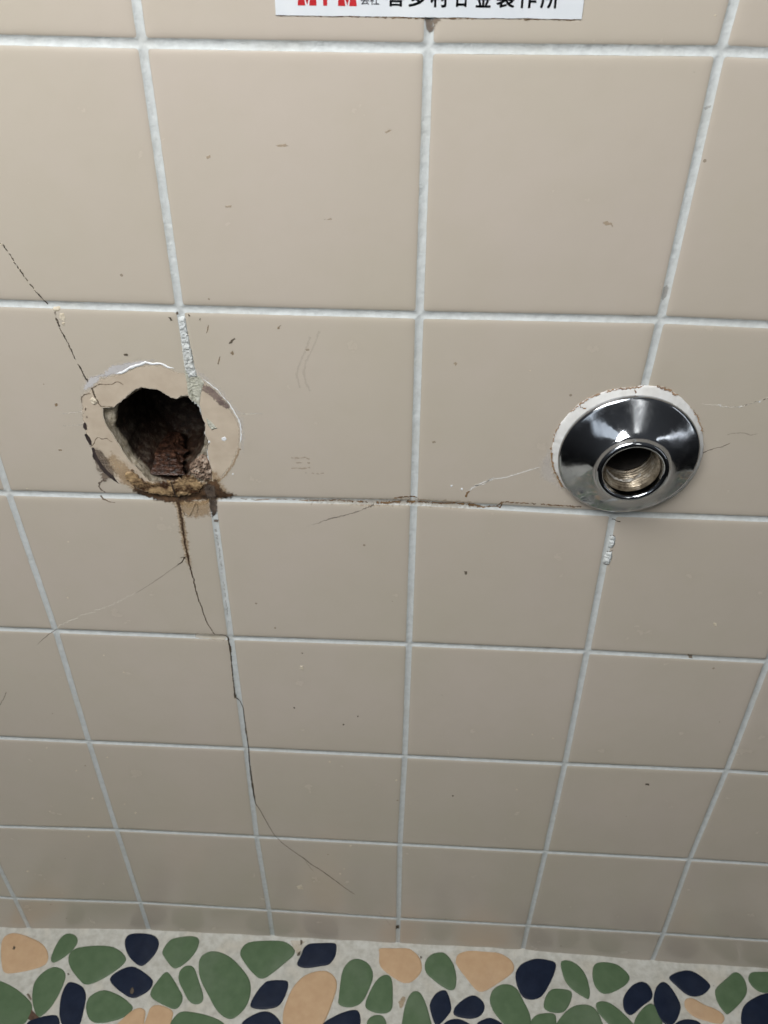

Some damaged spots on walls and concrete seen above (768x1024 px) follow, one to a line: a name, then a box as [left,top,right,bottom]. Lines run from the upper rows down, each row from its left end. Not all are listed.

crack [0,243,98,401]
spalling [83,397,118,503]
crack [241,467,581,522]
rust [570,385,644,412]
crack [170,482,352,893]